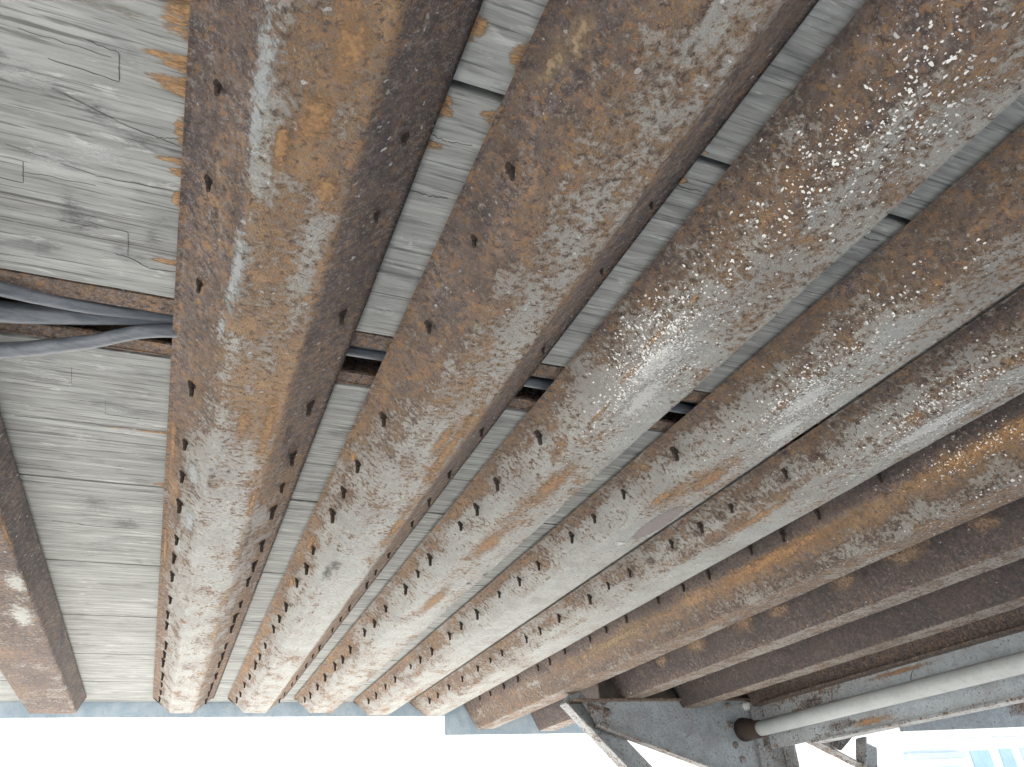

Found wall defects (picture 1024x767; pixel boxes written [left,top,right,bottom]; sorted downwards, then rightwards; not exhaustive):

corrosion [162,0,190,41]
corrosion [467,15,488,42]
corrosion [142,49,187,98]
corrosion [274,93,331,175]
corrosion [914,418,1024,483]
corrosion [531,465,577,503]
corrosion [475,528,506,557]
corrosion [722,530,826,586]
corrosion [420,589,446,613]
corrosion [792,695,821,712]
corrosion [829,715,890,730]